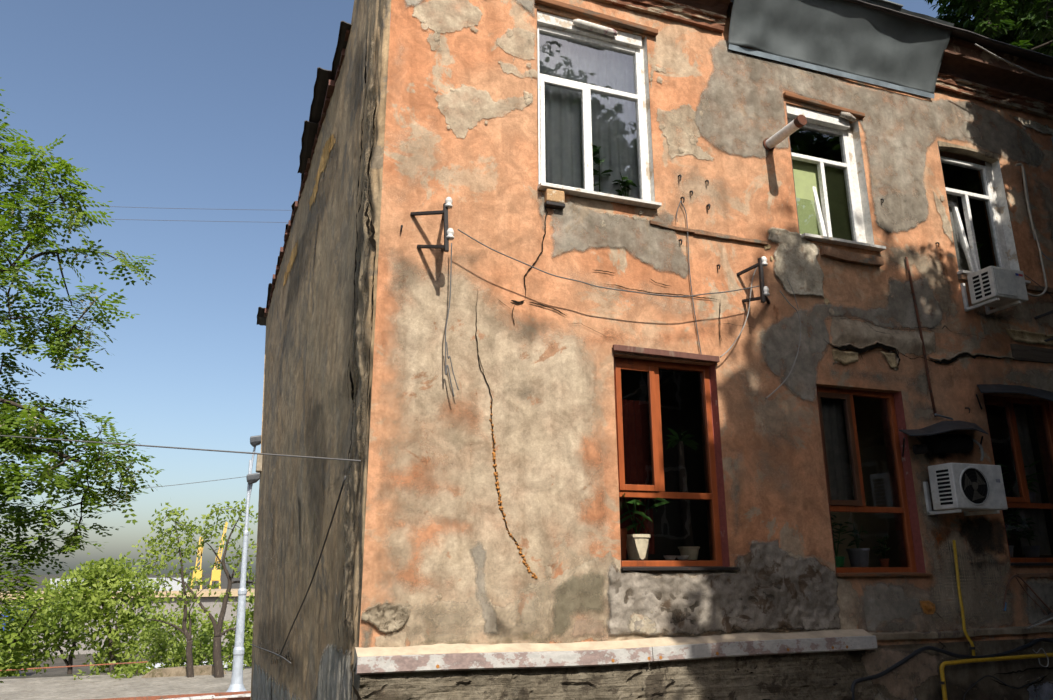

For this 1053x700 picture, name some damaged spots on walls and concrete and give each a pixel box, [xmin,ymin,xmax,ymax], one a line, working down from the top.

peeling [412,0,483,51]
crack [347,27,377,459]
crack [475,191,613,579]
peeling [341,27,806,647]
crack [595,270,750,340]
flaking render [764,227,830,305]
flaking render [832,349,860,365]
crack [824,318,1014,366]
peeling [890,247,957,319]
peeling [933,191,953,243]
peeling [914,454,1014,623]
peeling [860,649,946,700]